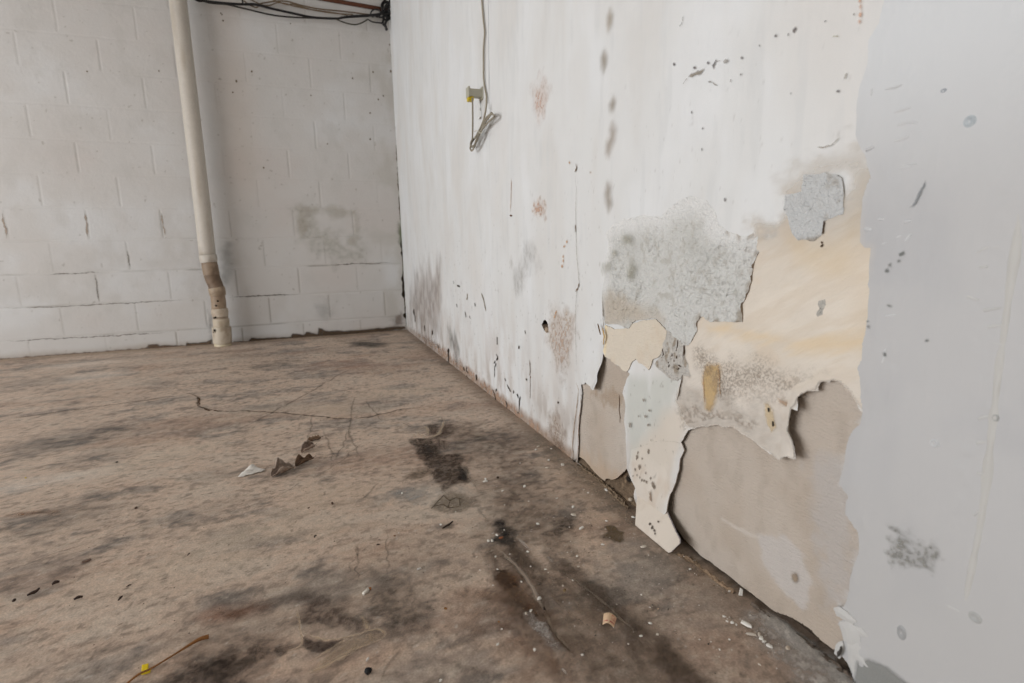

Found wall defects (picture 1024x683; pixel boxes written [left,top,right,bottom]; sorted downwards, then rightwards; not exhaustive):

water stain [703,366,720,410]
peeling [577,172,871,675]